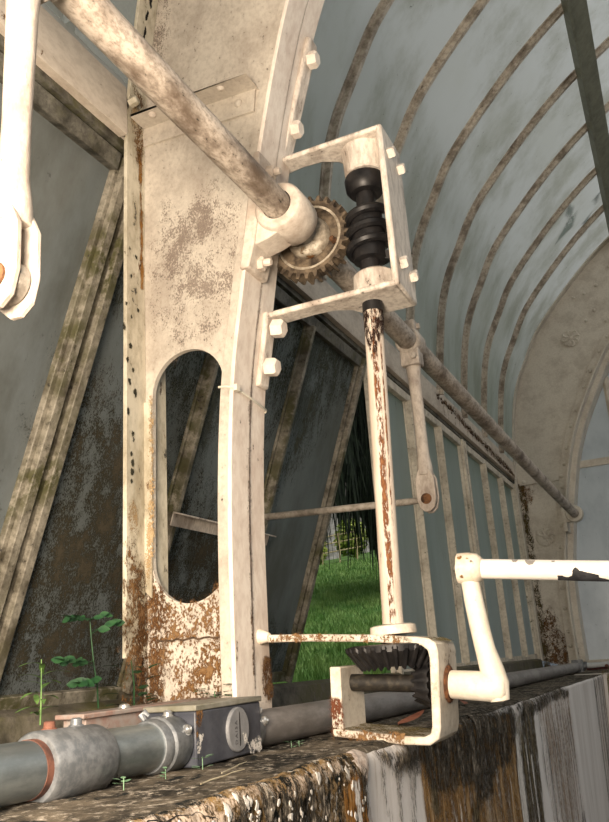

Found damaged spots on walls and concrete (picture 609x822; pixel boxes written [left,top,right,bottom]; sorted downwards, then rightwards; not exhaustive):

corrosion [131,86,145,290]
corrosion [117,397,222,705]
corrosion [518,484,536,560]
corrosion [532,580,569,667]
leakage [236,795,247,822]
leakage [254,775,330,822]
leakage [372,687,569,822]
leakage [594,675,609,800]